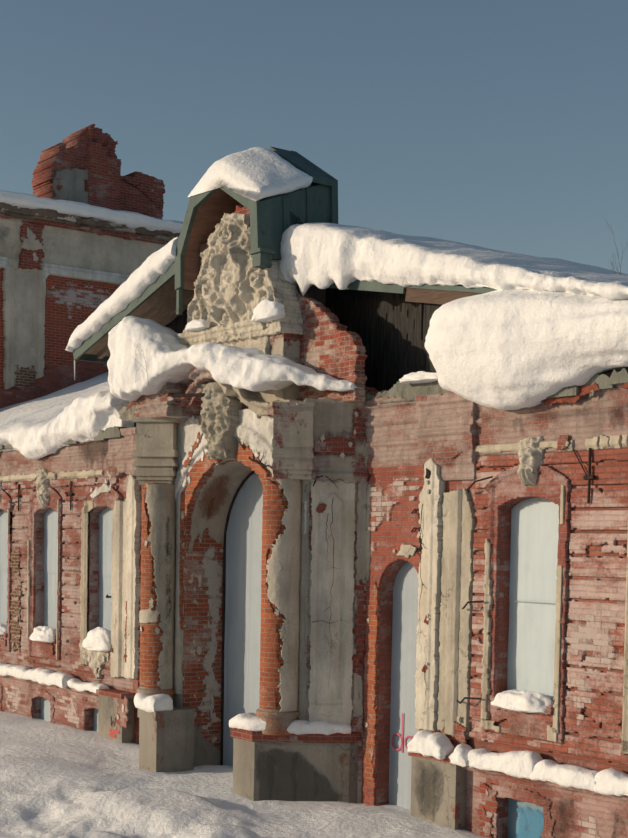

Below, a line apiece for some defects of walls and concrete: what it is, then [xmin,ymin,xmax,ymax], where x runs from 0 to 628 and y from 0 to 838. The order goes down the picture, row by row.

flaking render [18,220,45,270]
spalling [541,382,601,406]
flaking render [314,409,361,460]
rust [202,476,228,516]
flaking render [179,432,222,630]
flaking render [139,488,162,688]
flaking render [235,440,286,710]
crack [312,473,348,678]
peeling [198,546,223,718]
leakage [256,749,338,802]
leakage [417,763,441,815]